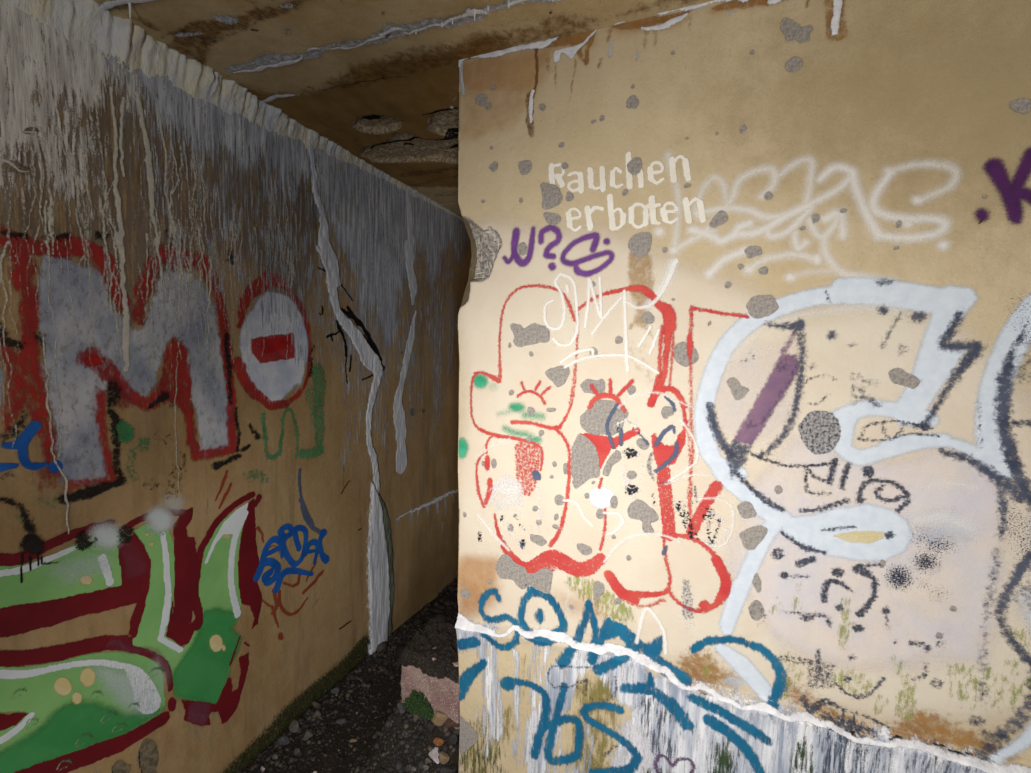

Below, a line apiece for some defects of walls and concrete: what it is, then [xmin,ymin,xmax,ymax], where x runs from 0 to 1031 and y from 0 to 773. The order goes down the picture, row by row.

crack [226,0,561,73]
crack [261,77,391,103]
spalling [352,97,459,164]
spalling [464,216,502,282]
leakage [0,0,597,637]
crack [318,267,385,383]
leakage [455,613,1031,773]